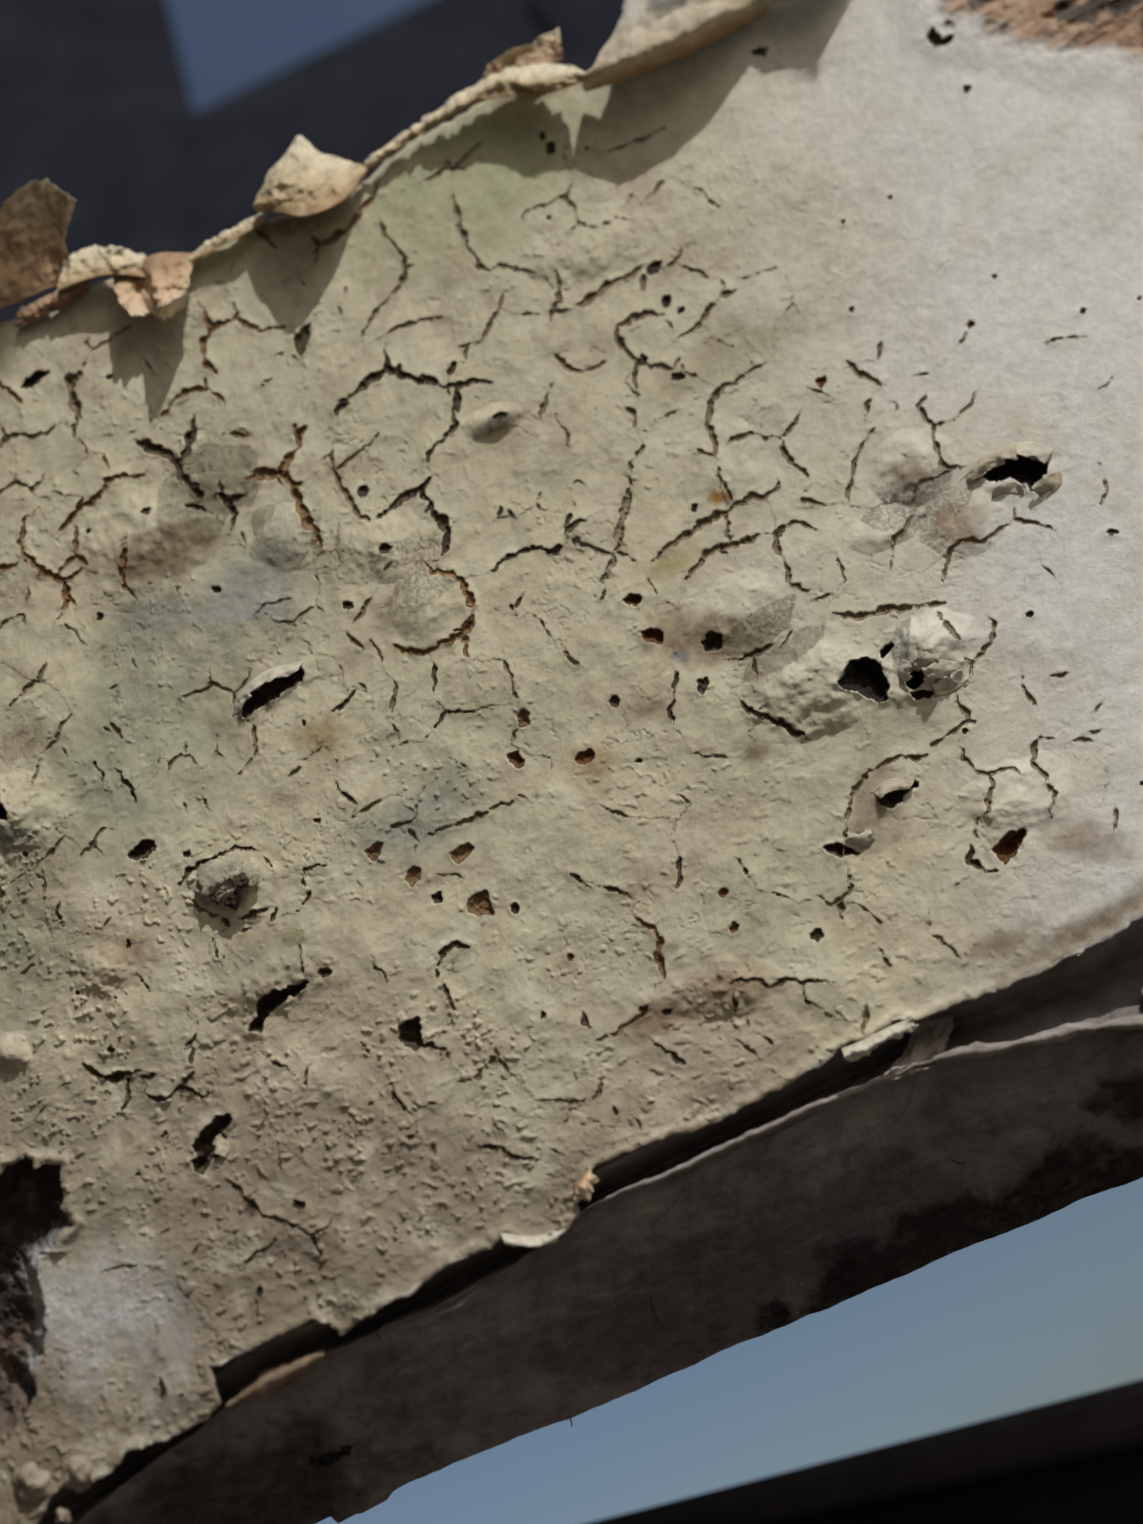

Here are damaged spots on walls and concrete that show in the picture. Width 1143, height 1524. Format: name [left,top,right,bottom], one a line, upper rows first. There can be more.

spalling [931,0,1143,63]
peeling [0,0,769,327]
peeling [294,325,310,357]
crack [0,127,1119,973]
crack [35,1007,212,1143]
crack [362,873,686,1162]
crack [726,977,870,1060]
peeling [842,1017,918,1062]
spalling [0,1156,73,1437]
crack [226,1119,345,1325]
damp [758,1140,1143,1331]
damp [139,1420,362,1524]